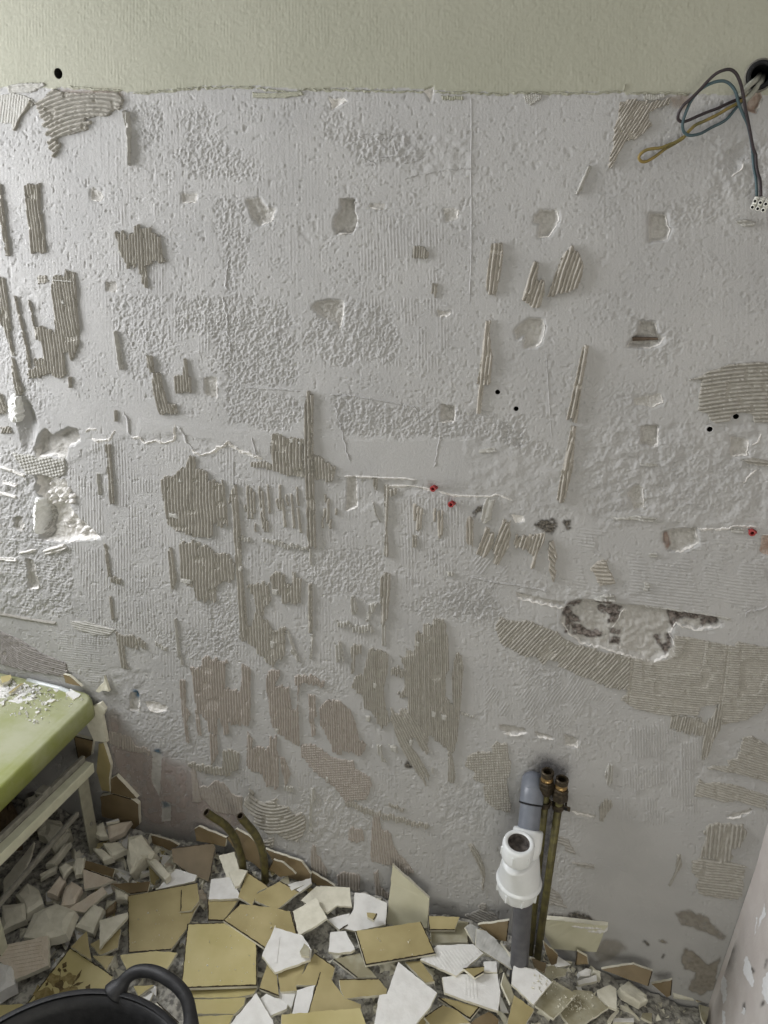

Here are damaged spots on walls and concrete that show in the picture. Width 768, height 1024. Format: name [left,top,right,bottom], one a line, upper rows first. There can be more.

flaking render [726,142,762,177]
flaking render [333,198,358,235]
flaking render [627,321,665,349]
flaking render [7,393,81,458]
crack [85,411,263,460]
flaking render [14,475,100,543]
flaking render [662,527,699,553]
flaking render [516,592,720,662]
spalling [35,673,83,714]
flaking render [130,692,168,713]
spalling [0,825,725,1024]
peeling [743,956,768,1004]